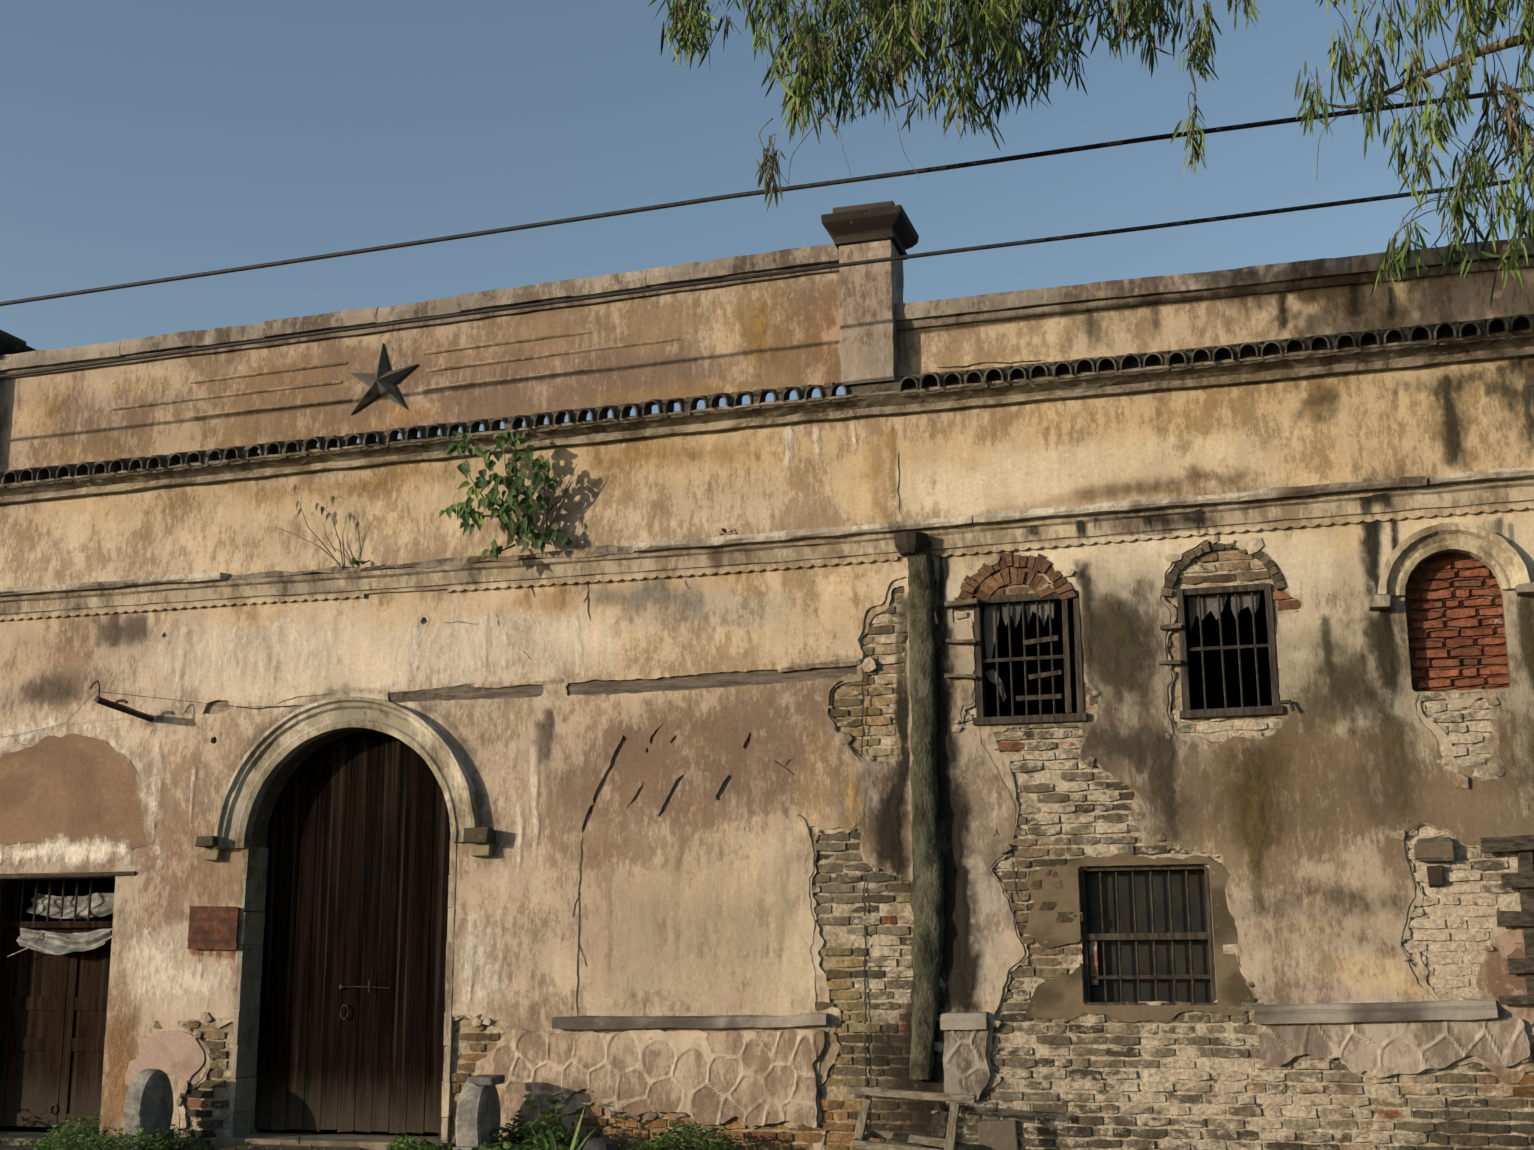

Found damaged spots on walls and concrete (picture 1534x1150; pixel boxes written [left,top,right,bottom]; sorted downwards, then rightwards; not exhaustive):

leakage [1434,358,1534,465]
flaking render [828,577,912,762]
flaking render [953,552,1075,633]
leakage [1075,561,1156,703]
leakage [1319,479,1412,812]
crack [572,837,586,1016]
leakage [868,556,979,1149]
flaking render [539,618,1534,1150]
leakage [1084,724,1178,838]
leakage [1225,747,1289,906]
flaking render [153,1012,238,1147]
flaking render [443,1011,511,1147]